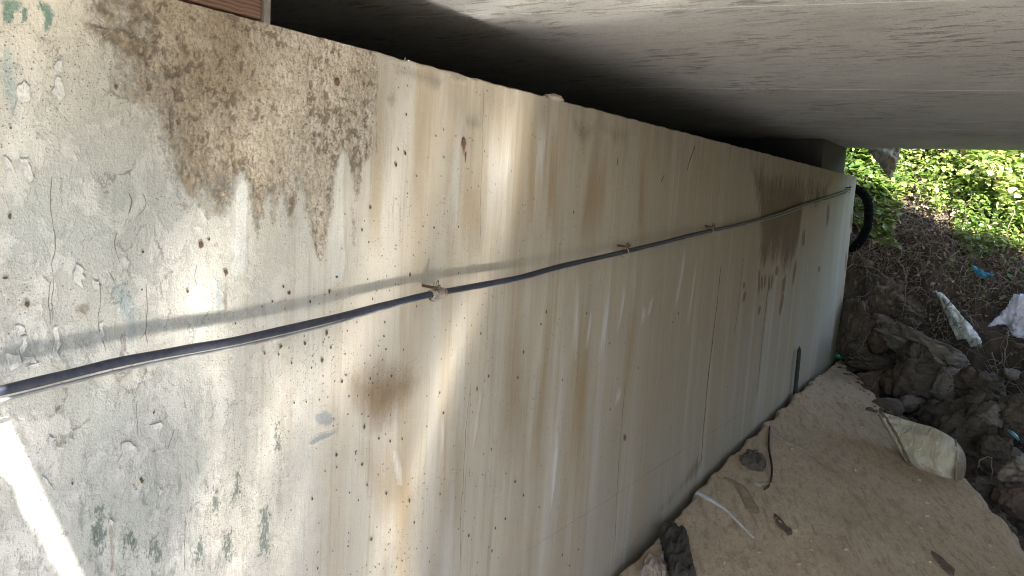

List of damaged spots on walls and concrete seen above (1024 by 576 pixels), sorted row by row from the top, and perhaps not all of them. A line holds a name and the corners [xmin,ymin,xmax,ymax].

peeling [16,81,31,103]
damp [232,177,249,280]
peeling [5,325,39,372]
damp [333,339,428,553]